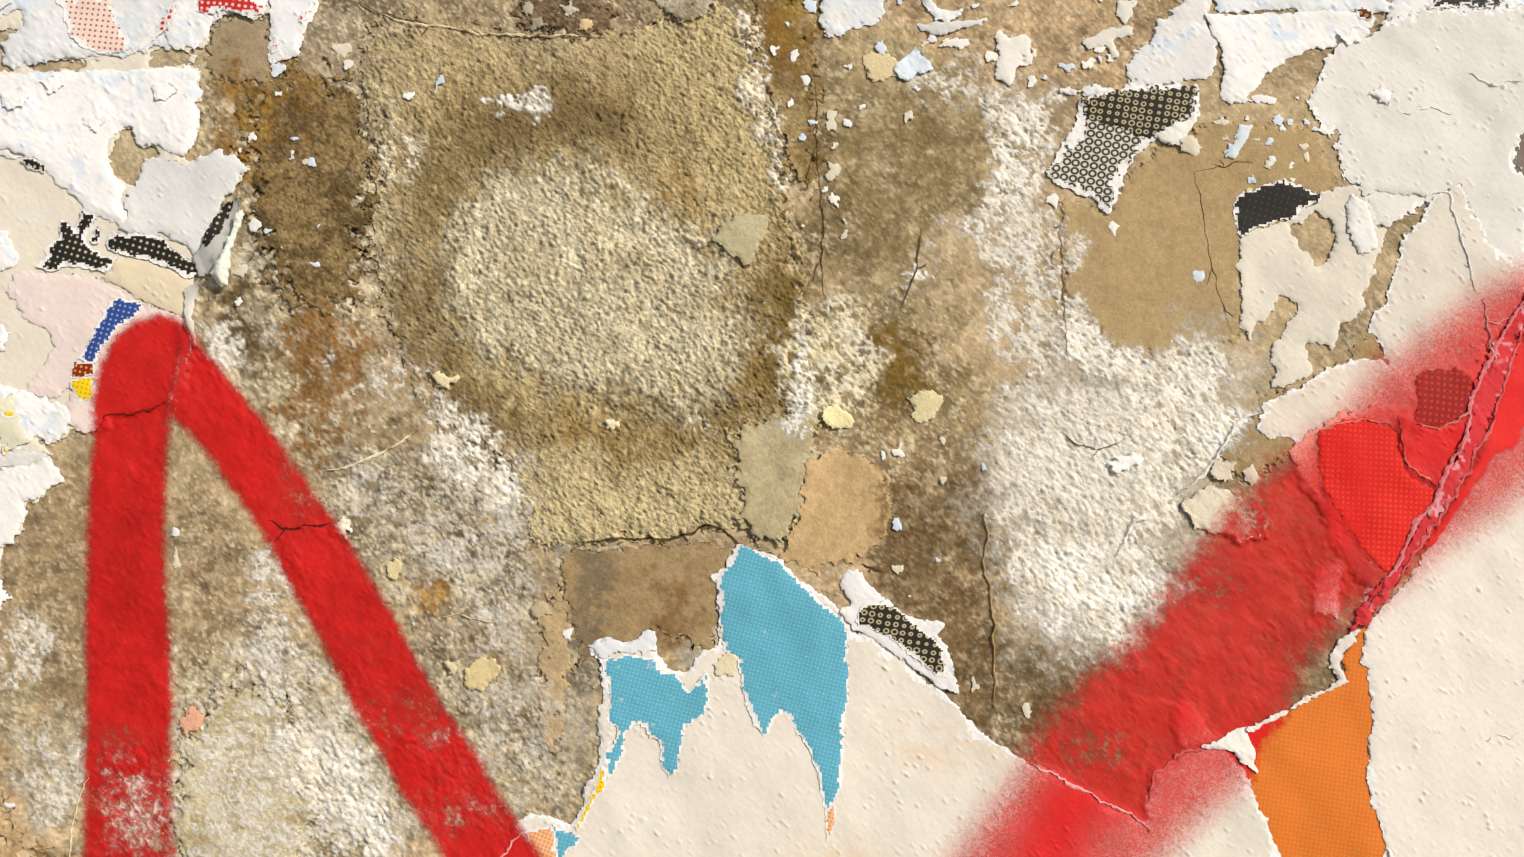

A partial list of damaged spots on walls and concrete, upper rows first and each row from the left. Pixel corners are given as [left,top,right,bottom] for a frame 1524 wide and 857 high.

damp [359,118,427,185]
damp [479,85,553,125]
damp [730,5,792,193]
flaking render [1056,115,1339,361]
damp [882,55,1268,730]
crack [569,524,778,558]
flaking render [0,790,58,857]
spalling [162,661,325,857]